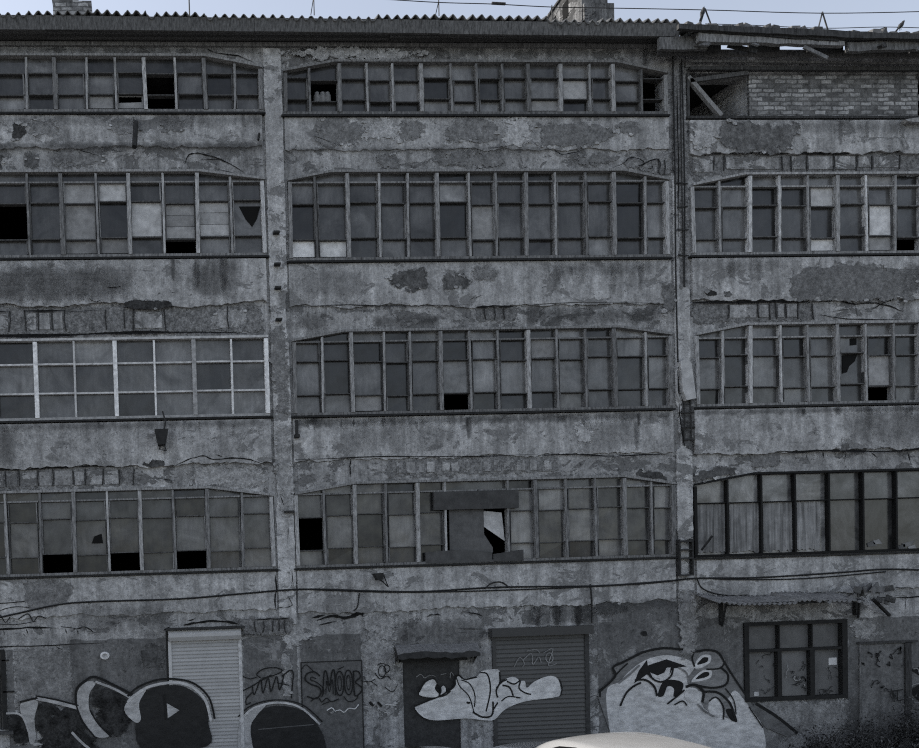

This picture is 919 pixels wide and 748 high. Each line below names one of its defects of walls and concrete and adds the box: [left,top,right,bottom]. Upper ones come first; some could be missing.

peeling [11,118,59,141]
flaking render [24,151,39,169]
spalling [442,56,919,325]
flaking render [385,267,428,294]
crack [819,299,906,320]
crack [780,448,919,463]
peeling [593,601,629,617]